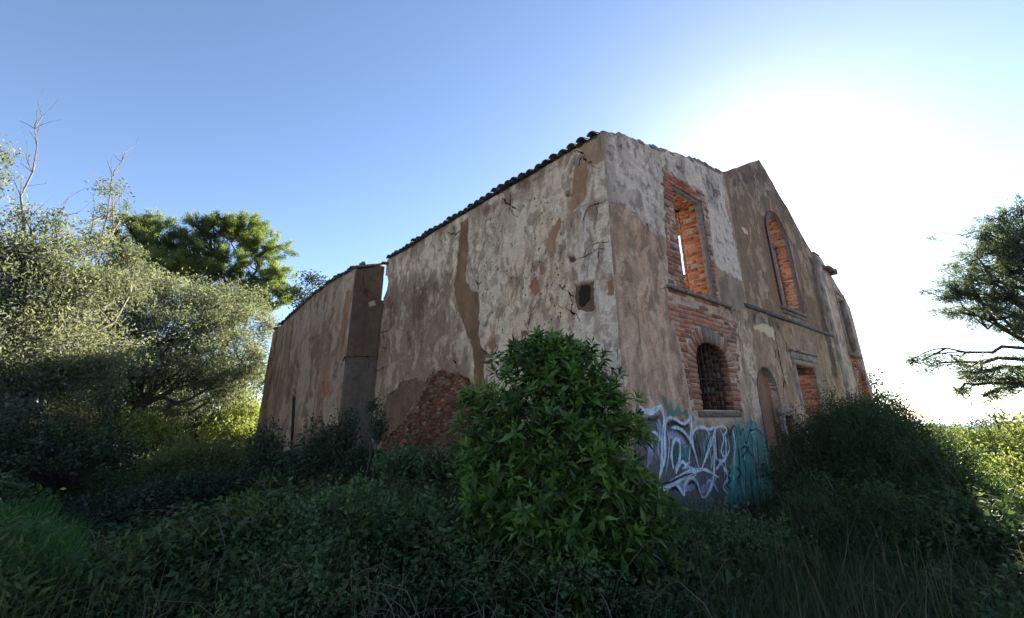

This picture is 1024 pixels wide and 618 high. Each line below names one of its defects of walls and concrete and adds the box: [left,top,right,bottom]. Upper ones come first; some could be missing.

flaking render [381,218,496,457]
crack [481,200,653,367]
peeling [529,132,748,312]